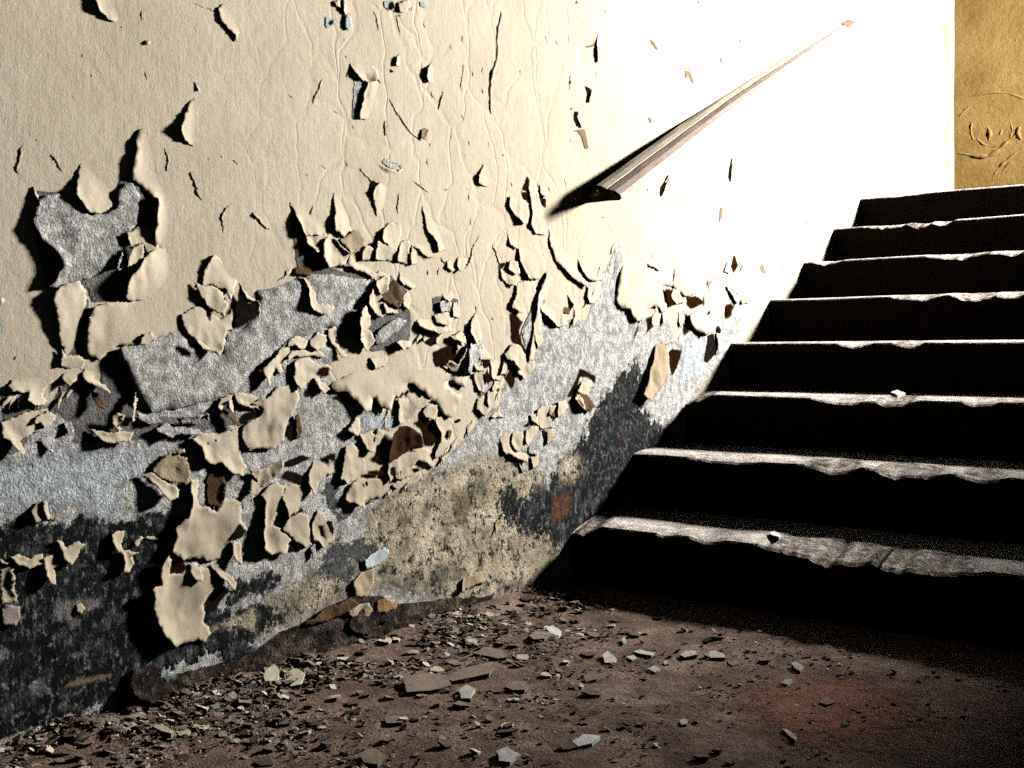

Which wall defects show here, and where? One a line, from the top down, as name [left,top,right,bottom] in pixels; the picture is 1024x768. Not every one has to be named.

peeling [181,82,200,147]
crack [288,39,347,114]
crack [304,13,566,193]
crack [545,34,602,149]
flaking render [0,128,749,678]
mould [495,355,677,559]
leakage [319,479,385,583]
leakage [0,445,285,742]
flaking render [0,688,131,741]